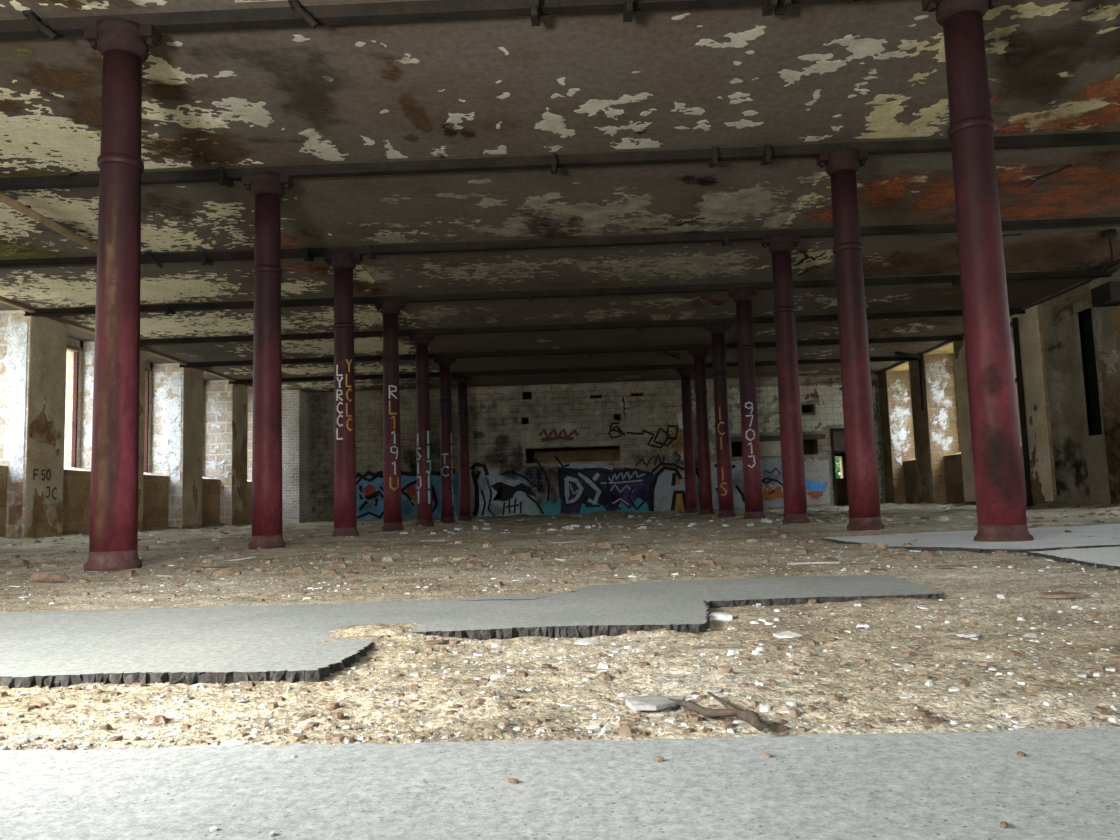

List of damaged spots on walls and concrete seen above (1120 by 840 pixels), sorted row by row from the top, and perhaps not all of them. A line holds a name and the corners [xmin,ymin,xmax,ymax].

peeling [983,2,1069,55]
peeling [0,80,101,173]
peeling [142,52,237,85]
peeling [141,97,285,169]
peeling [298,129,349,161]
peeling [534,77,661,152]
peeling [671,13,766,131]
peeling [777,15,949,142]
rust [994,76,1120,134]
peeling [995,74,1120,132]
peeling [0,189,99,254]
peeling [141,201,255,252]